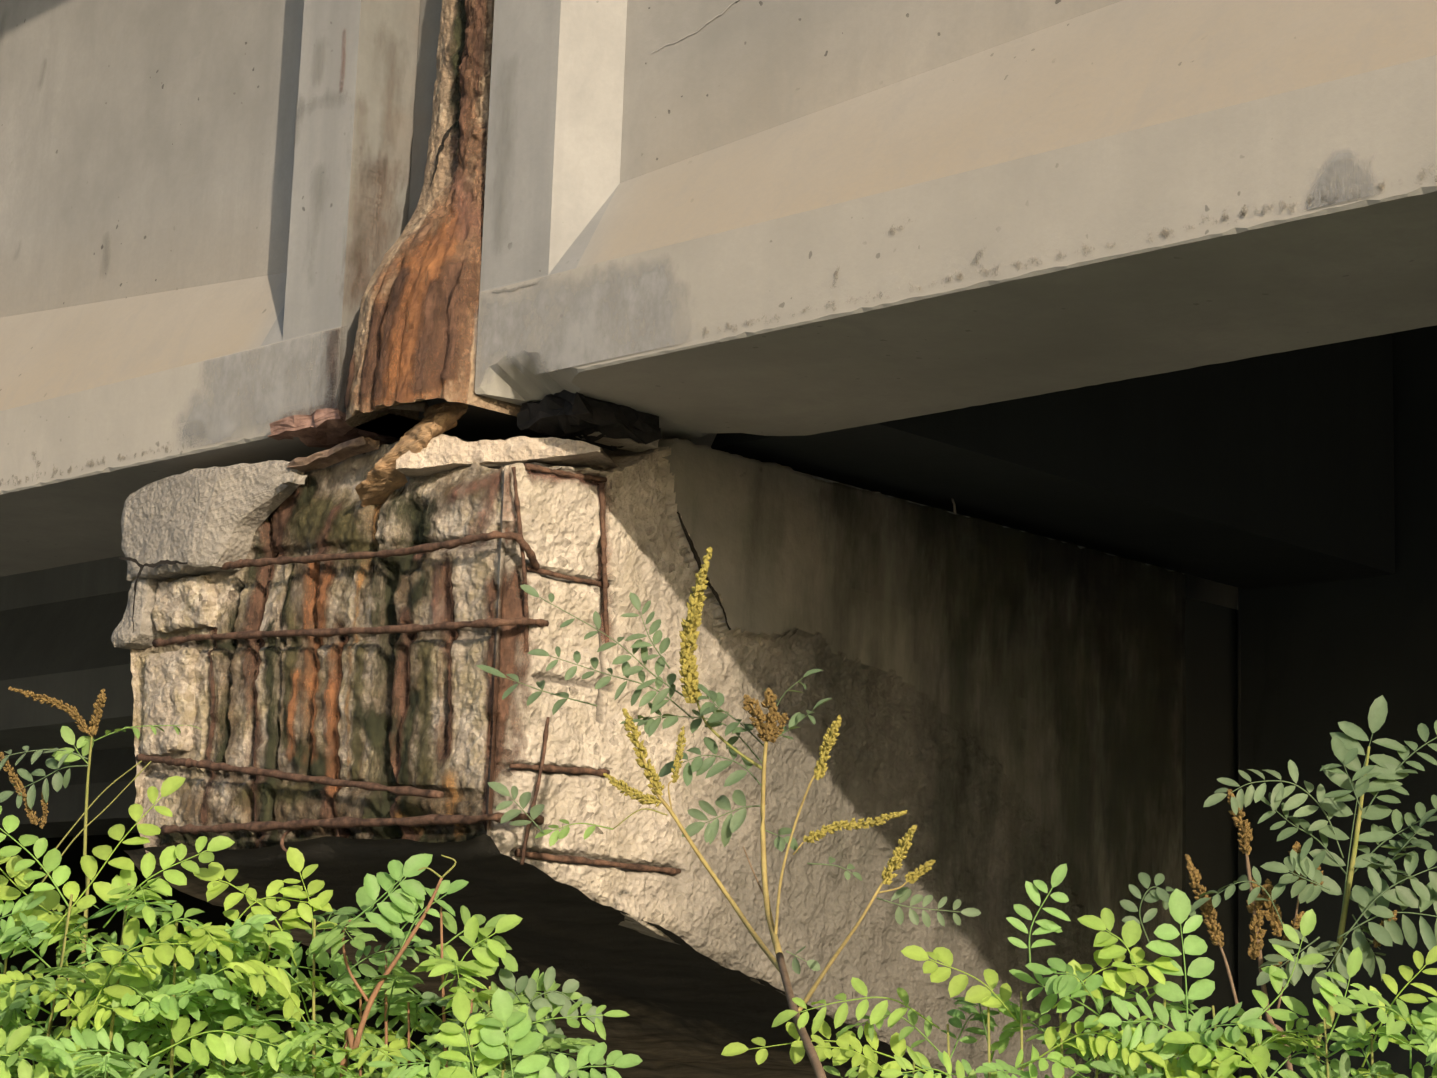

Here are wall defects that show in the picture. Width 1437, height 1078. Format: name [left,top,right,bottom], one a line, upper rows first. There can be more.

corrosion [310,0,487,415]
corrosion [200,626,218,824]
corrosion [243,486,300,847]
corrosion [287,504,364,838]
leakage [158,466,504,850]
corrosion [390,608,421,841]
corrosion [415,553,461,832]
corrosion [482,566,530,830]
corrosion [599,547,609,642]
spalling [111,432,1128,1078]